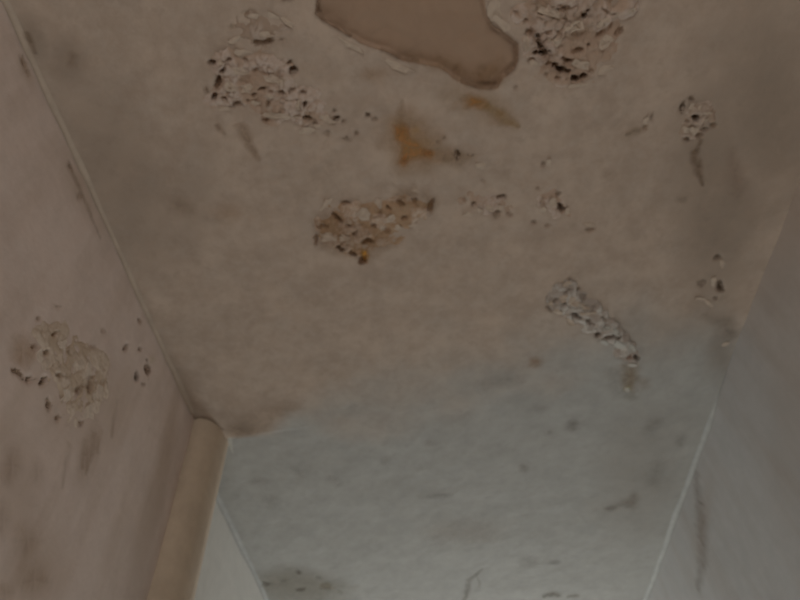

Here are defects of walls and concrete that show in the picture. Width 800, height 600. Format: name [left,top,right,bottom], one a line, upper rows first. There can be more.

peeling [202,10,339,134]
spalling [314,0,639,90]
peeling [314,187,433,264]